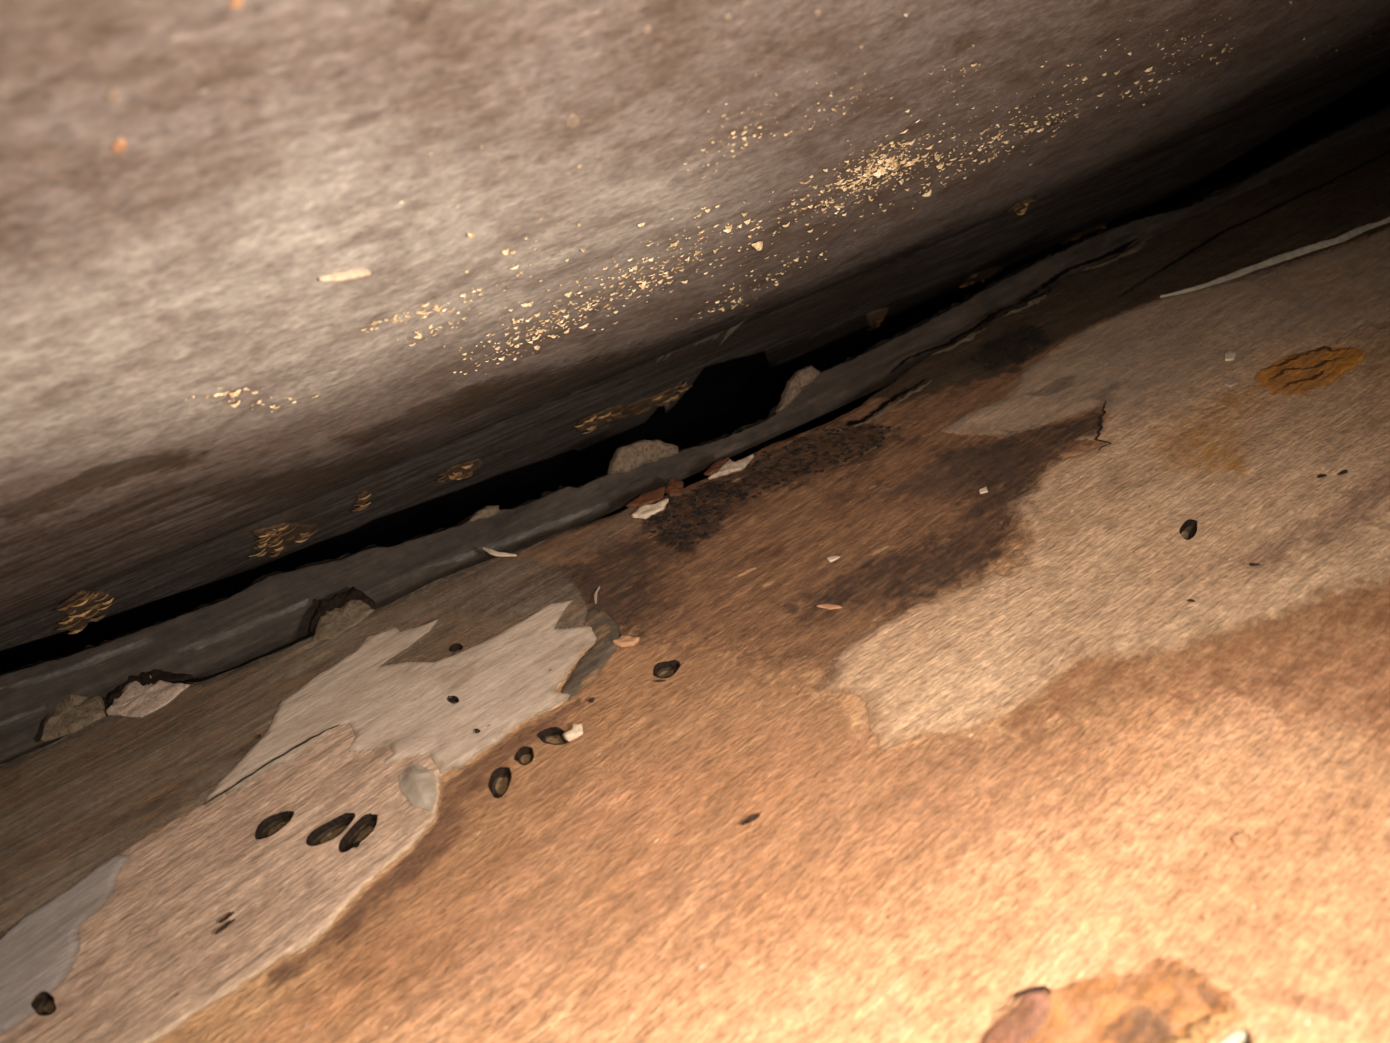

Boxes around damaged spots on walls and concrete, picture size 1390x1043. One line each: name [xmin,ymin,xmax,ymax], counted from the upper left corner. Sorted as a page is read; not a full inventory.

leakage [0,127,1390,939]
crack [847,118,1390,427]
rust [1173,346,1365,471]
peeling [0,600,620,1043]